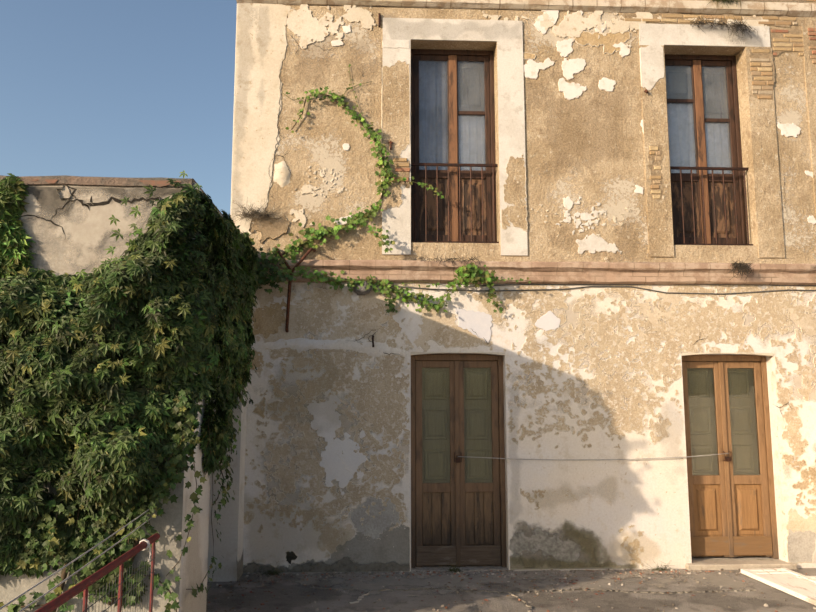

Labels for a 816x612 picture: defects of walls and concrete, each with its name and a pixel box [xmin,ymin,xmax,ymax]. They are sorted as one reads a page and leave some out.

crack [21,186,161,234]
peeling [501,155,609,234]
peeling [243,283,493,573]
peeling [467,285,816,567]
damp [509,522,600,565]